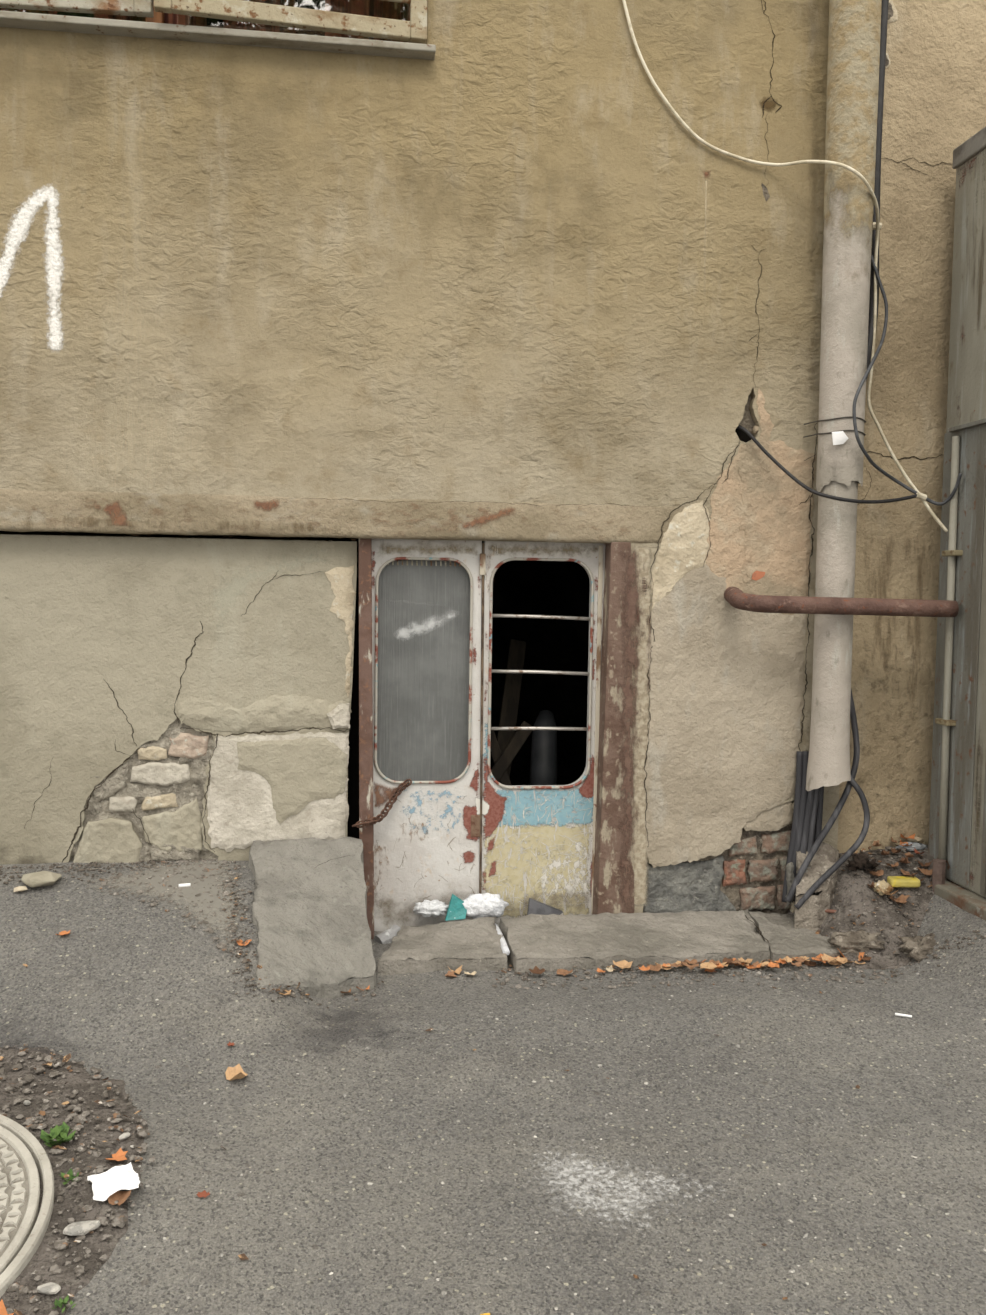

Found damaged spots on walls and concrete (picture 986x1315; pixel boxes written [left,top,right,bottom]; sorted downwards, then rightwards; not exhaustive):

crack [761,0,782,197]
crack [749,245,764,387]
crack [241,570,320,616]
crack [62,681,137,862]
flaking render [70,566,356,863]
crack [174,621,348,852]
peeling [475,798,489,815]
flaking render [617,500,839,931]